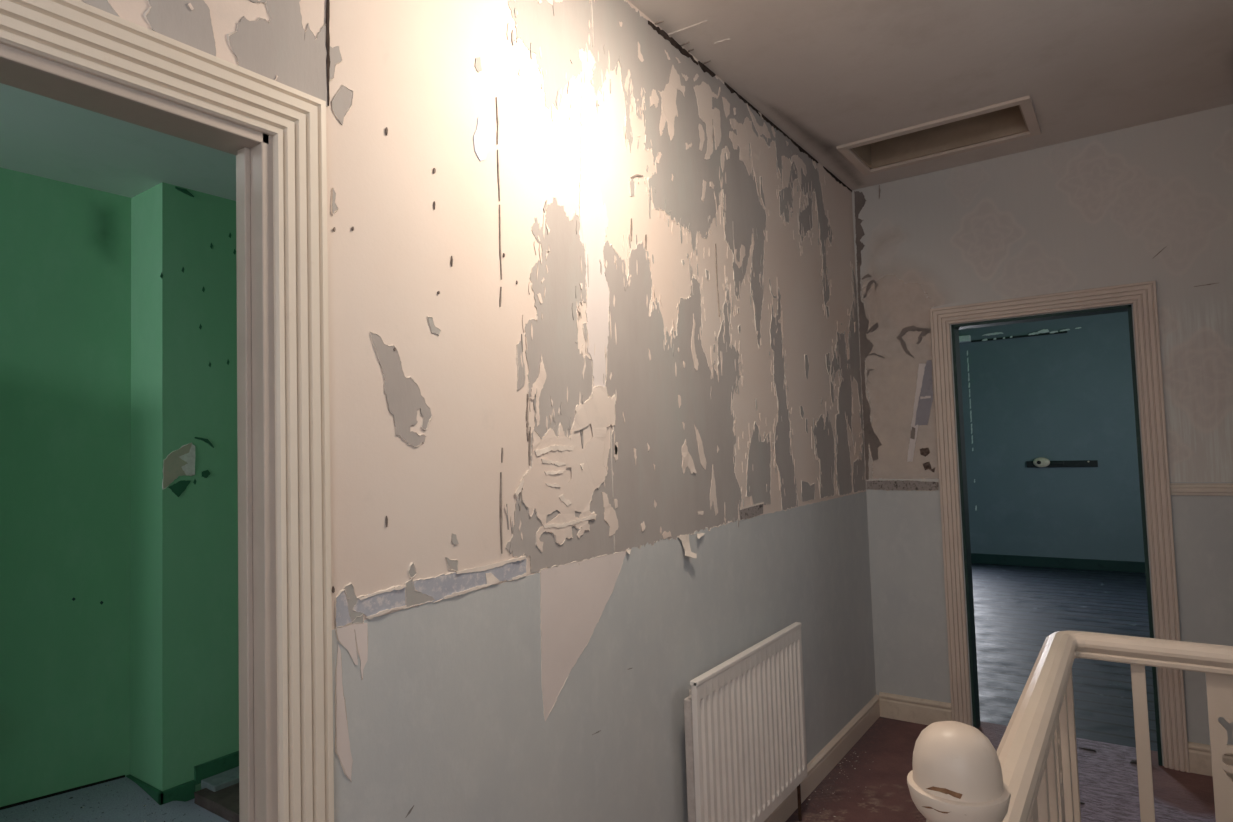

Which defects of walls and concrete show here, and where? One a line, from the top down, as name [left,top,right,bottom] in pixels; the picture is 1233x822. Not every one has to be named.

peeling [79,0,119,17]
peeling [143,0,353,125]
peeling [330,187,338,232]
peeling [504,0,882,573]
peeling [427,316,441,336]
peeling [370,332,432,447]
peeling [910,360,933,439]
peeling [162,437,214,497]
peeling [445,533,459,572]
peeling [332,582,364,624]
peeling [404,562,435,609]